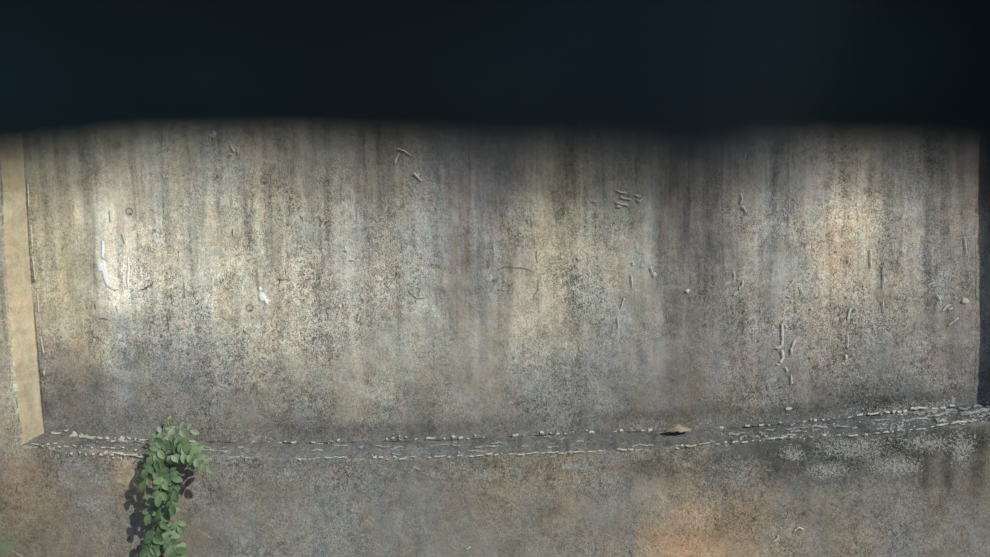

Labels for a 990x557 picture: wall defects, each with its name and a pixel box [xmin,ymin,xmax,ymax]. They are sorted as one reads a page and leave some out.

efflorescence [98,240,130,290]